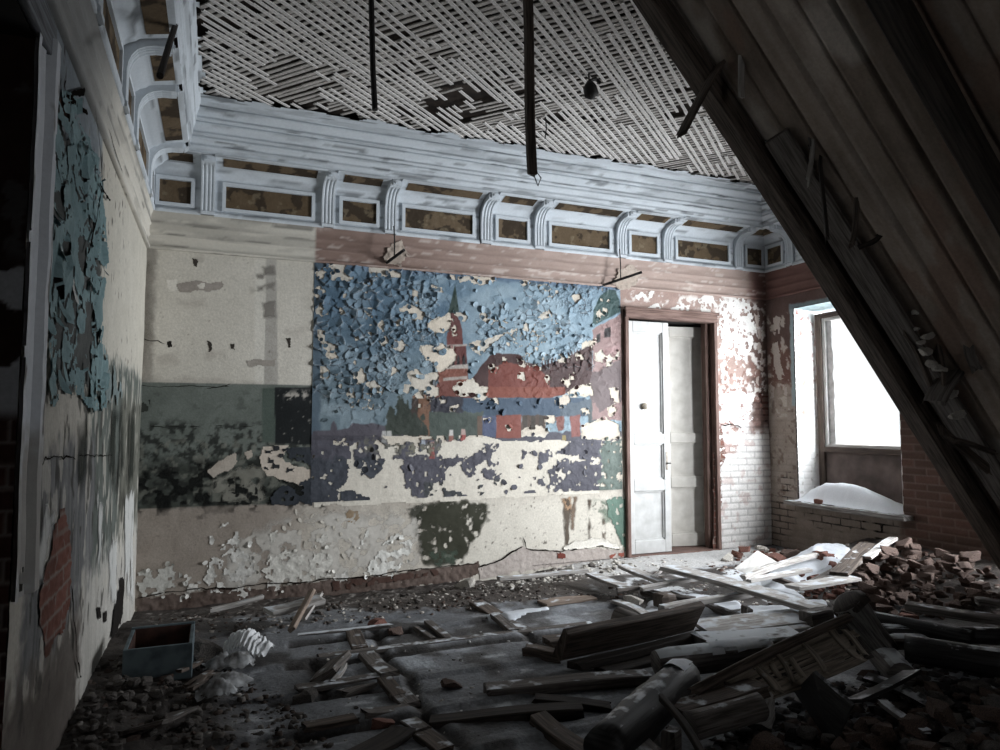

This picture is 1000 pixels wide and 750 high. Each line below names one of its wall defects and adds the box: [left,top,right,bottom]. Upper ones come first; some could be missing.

peeling [48,81,123,413]
peeling [314,240,410,316]
spalling [136,274,626,611]
peeling [612,265,788,549]
flaking render [39,508,82,678]